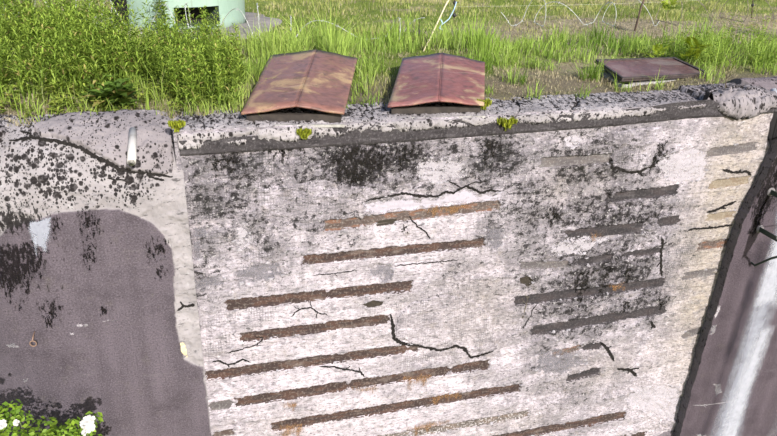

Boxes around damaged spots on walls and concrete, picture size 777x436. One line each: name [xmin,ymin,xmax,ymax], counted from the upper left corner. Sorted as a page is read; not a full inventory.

crack [9,130,173,181]
crack [364,180,504,202]
leakage [2,218,57,309]
crack [177,271,206,313]
crack [390,314,493,359]
leakage [717,242,777,436]